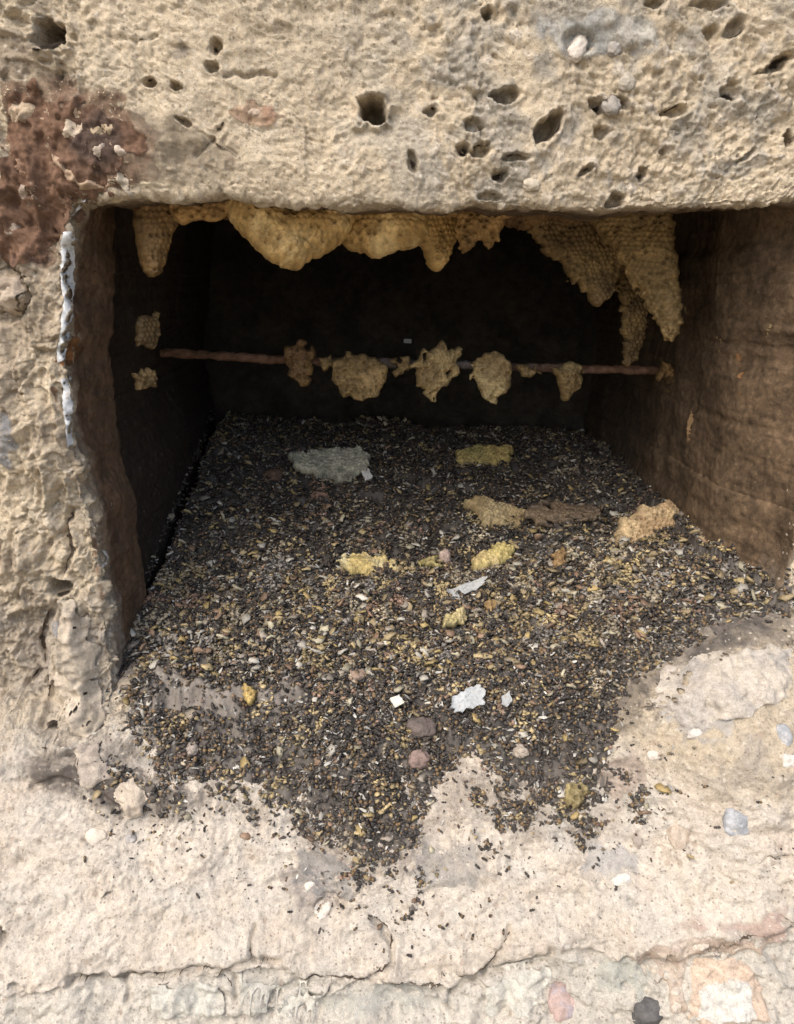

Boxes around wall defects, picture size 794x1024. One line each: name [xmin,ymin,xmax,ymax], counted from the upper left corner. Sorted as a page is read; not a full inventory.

crack [723,914,792,947]
crack [78,948,276,987]
crack [279,916,549,994]